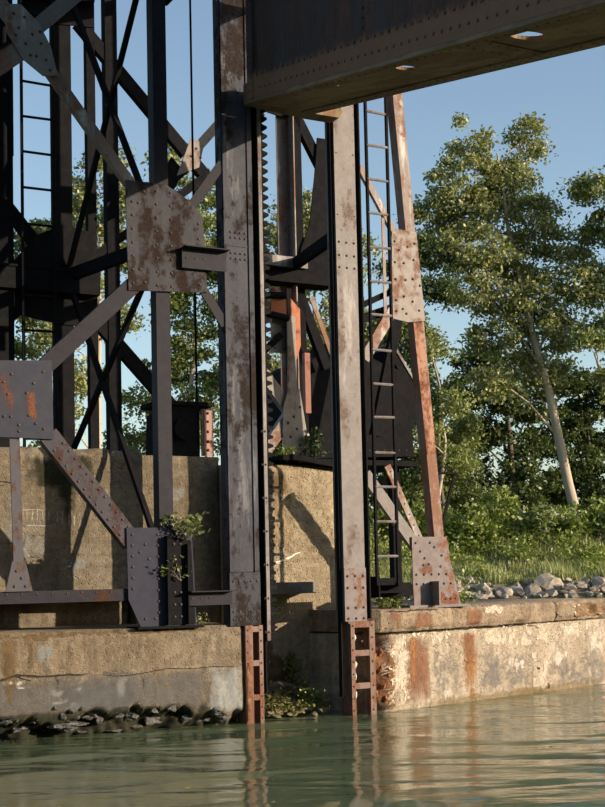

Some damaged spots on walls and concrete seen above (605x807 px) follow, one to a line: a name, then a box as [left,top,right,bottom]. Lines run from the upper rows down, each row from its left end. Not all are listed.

corrosion [27,394,36,417]
crack [0,666,237,689]
corrosion [408,639,430,698]
corrosion [464,609,482,699]